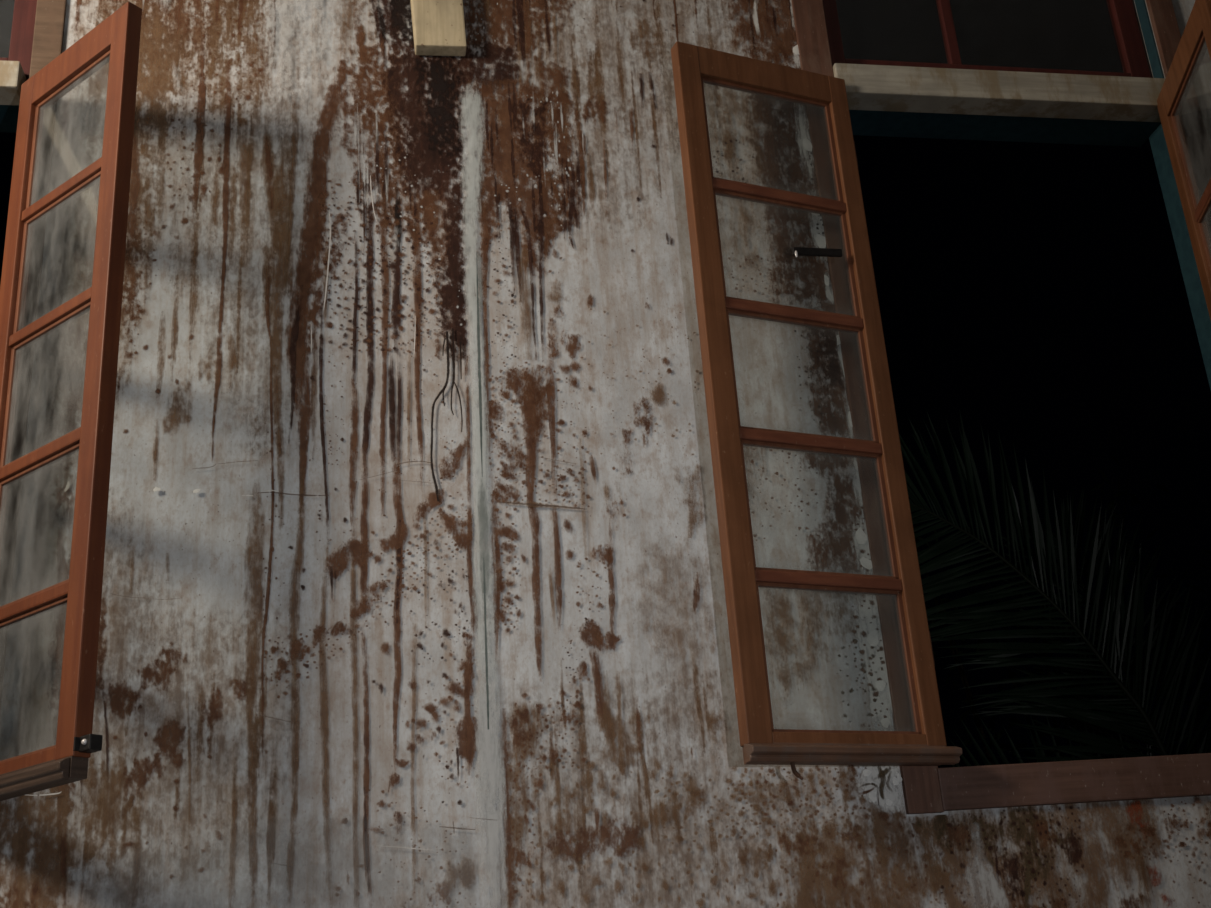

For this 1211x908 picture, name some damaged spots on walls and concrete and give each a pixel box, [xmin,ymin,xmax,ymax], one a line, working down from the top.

corrosion [728,0,801,69]
corrosion [711,93,819,197]
corrosion [720,200,835,313]
corrosion [607,348,676,474]
corrosion [795,326,850,438]
corrosion [264,35,626,908]
corrosion [743,447,871,574]
corrosion [693,575,711,629]
corrosion [765,590,866,691]
corrosion [95,598,187,826]
corrosion [201,673,251,758]
corrosion [633,765,1211,908]